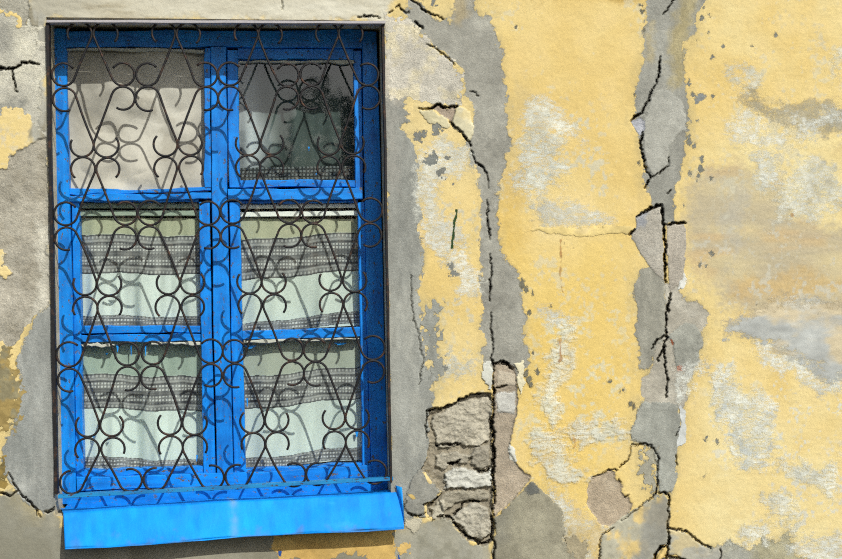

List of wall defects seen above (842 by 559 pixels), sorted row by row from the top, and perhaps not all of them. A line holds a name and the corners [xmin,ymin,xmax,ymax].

crack [0,61,37,92]
crack [363,1,453,62]
peeling [687,77,714,104]
spalling [0,0,51,436]
crack [420,104,491,236]
crack [630,56,685,398]
peeling [686,133,714,182]
crack [404,257,513,557]
spalling [396,299,633,559]
peeling [637,444,661,500]
crack [599,443,722,559]
peeling [657,524,770,559]